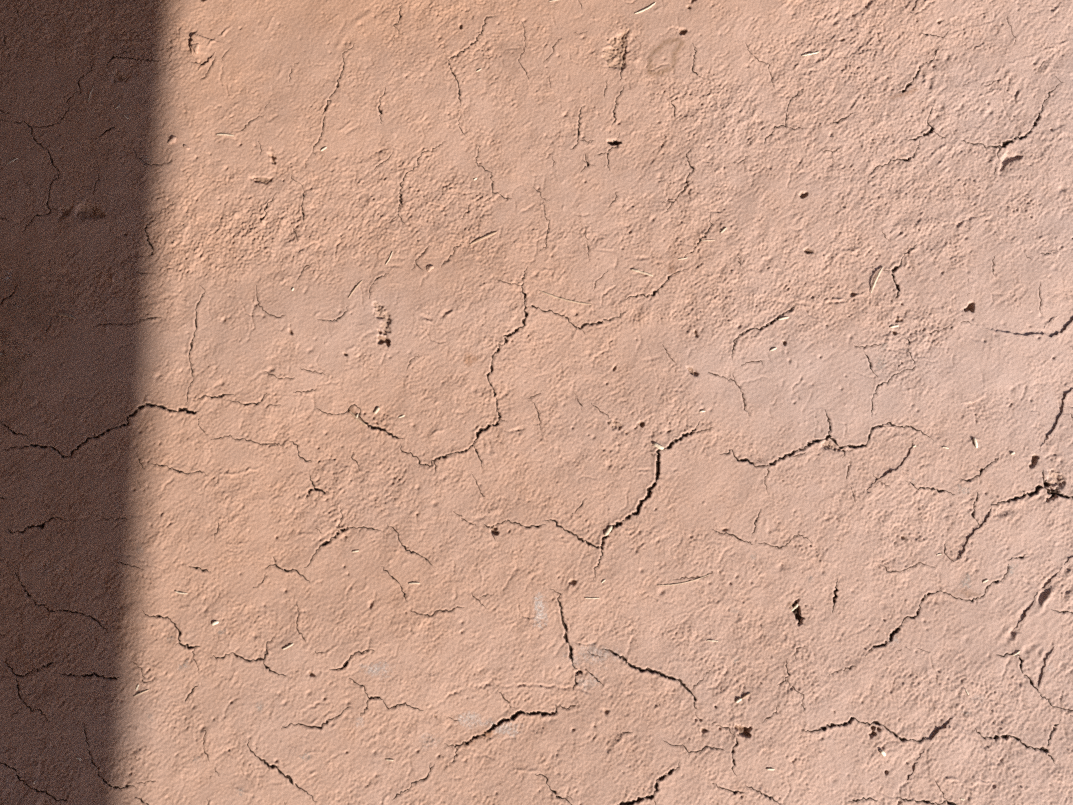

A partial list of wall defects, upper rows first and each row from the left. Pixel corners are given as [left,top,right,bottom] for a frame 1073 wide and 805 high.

crack [873,60,1065,174]
crack [0,16,713,588]
crack [882,231,916,299]
crack [708,307,795,414]
crack [712,321,1073,549]
crack [142,605,424,729]
crack [393,589,779,805]
crack [764,646,926,742]
crack [827,545,1029,678]
crack [975,653,1073,764]
crack [247,740,314,803]
crack [848,781,956,805]